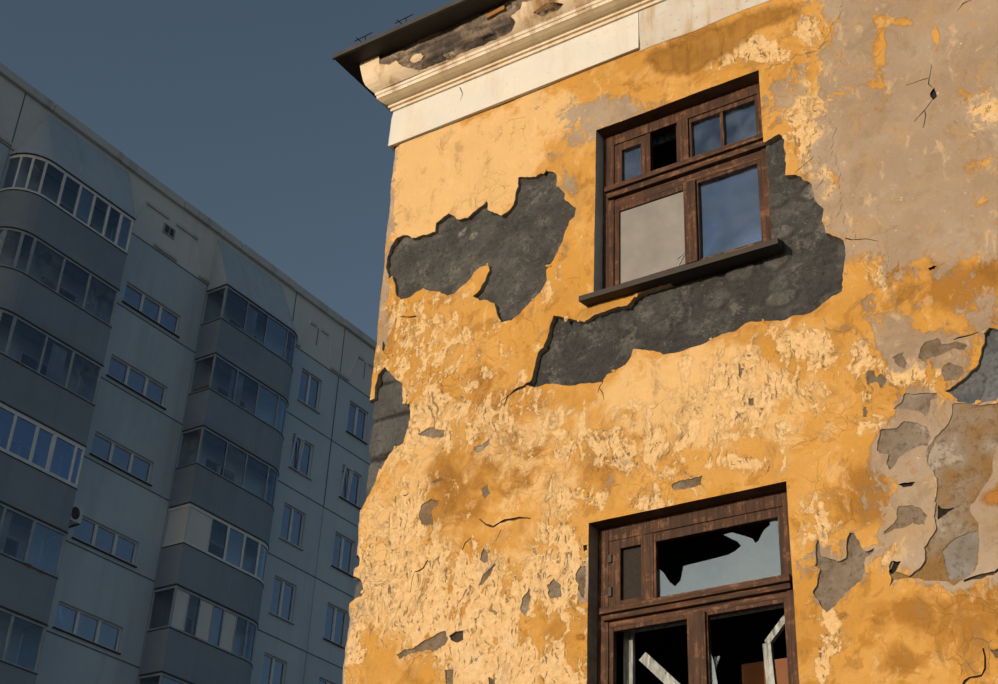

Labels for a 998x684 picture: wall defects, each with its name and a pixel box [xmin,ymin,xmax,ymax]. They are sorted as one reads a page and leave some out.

spalling [379,0,563,71]
peeling [765,0,998,273]
crack [907,71,933,127]
spalling [386,168,576,322]
spalling [524,134,846,387]
peeling [866,370,887,388]
spalling [366,367,444,497]
peeling [877,327,998,587]
crack [462,517,531,550]
peeling [813,533,874,612]
crack [963,648,986,684]